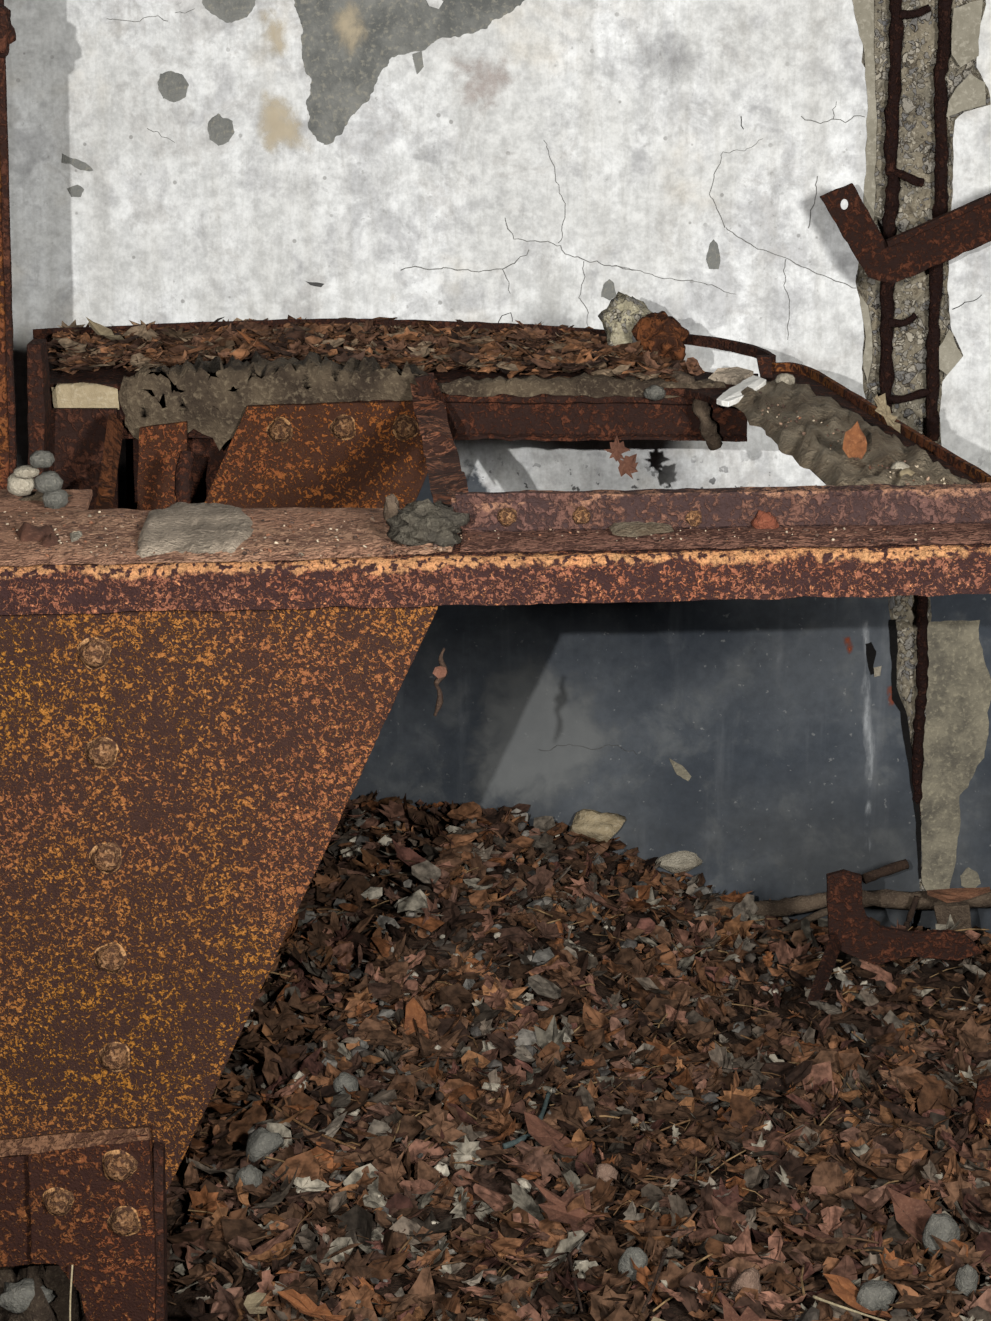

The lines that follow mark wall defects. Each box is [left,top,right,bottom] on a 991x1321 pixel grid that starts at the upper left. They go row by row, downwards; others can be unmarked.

crack [801,101,865,124]
spalling [852,0,991,242]
crack [401,141,733,326]
crack [709,116,853,340]
spalling [856,261,963,446]
corrosion [16,522,82,548]
corrosion [609,521,674,537]
peeling [866,595,991,891]